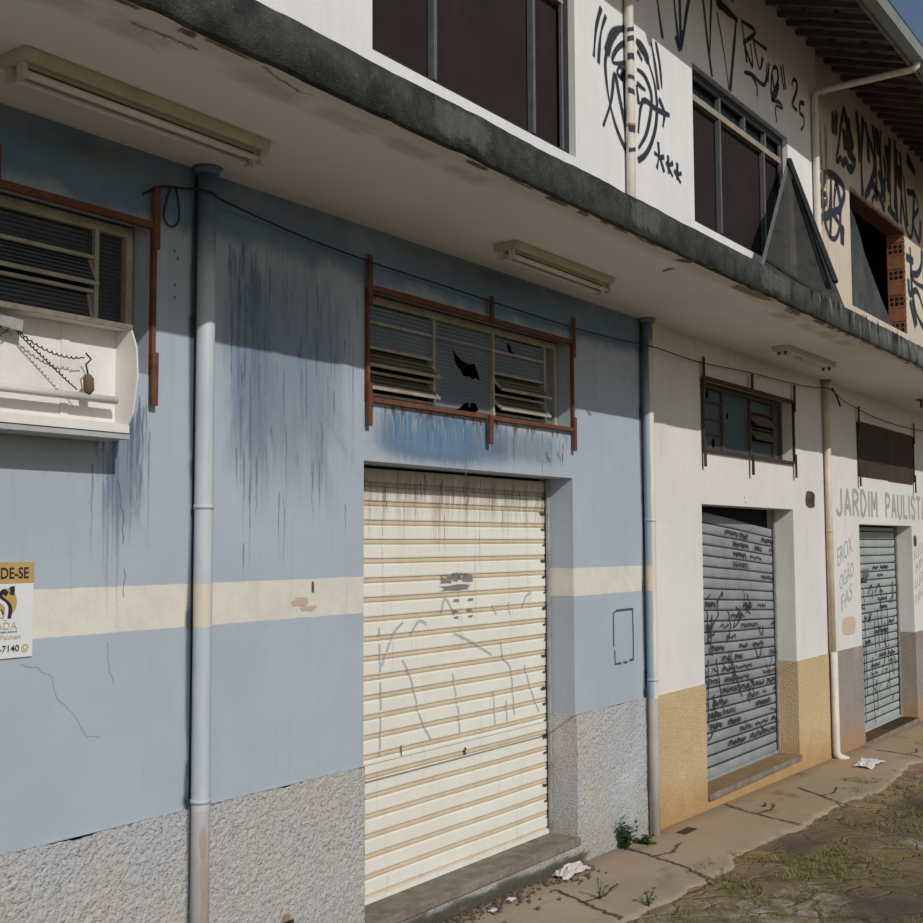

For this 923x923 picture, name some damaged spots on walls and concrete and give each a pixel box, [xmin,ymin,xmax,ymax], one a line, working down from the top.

damp [237,300,324,437]
damp [108,440,132,504]
peeling [292,581,316,611]